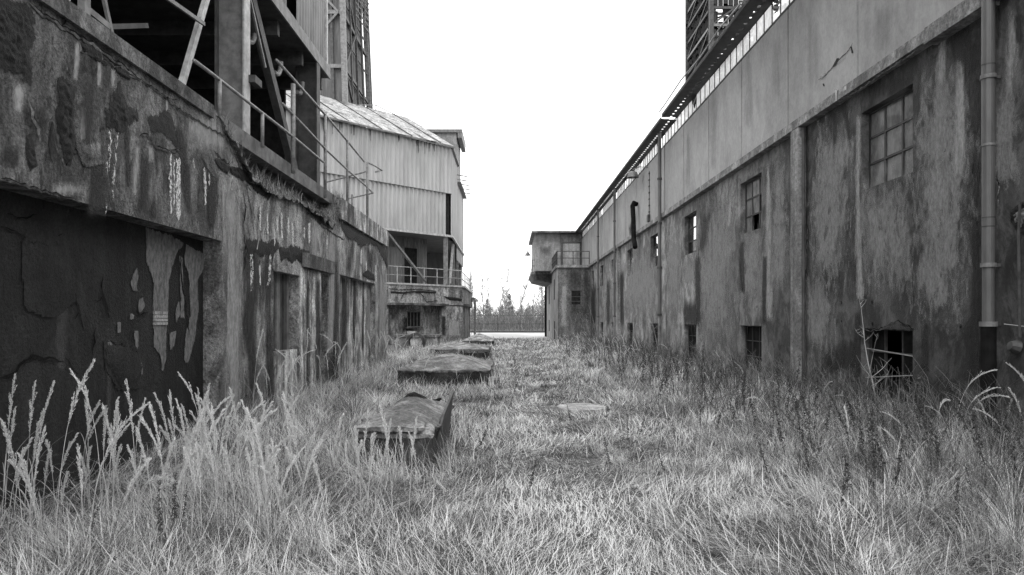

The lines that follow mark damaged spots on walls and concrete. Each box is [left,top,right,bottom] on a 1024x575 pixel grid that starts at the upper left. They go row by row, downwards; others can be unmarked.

damp [14,86,23,111]
damp [74,43,115,140]
damp [995,8,1021,183]
damp [53,129,156,216]
flaking render [108,227,204,371]
spalling [244,237,310,263]
damp [169,115,412,424]
damp [683,167,790,353]
damp [805,26,980,385]